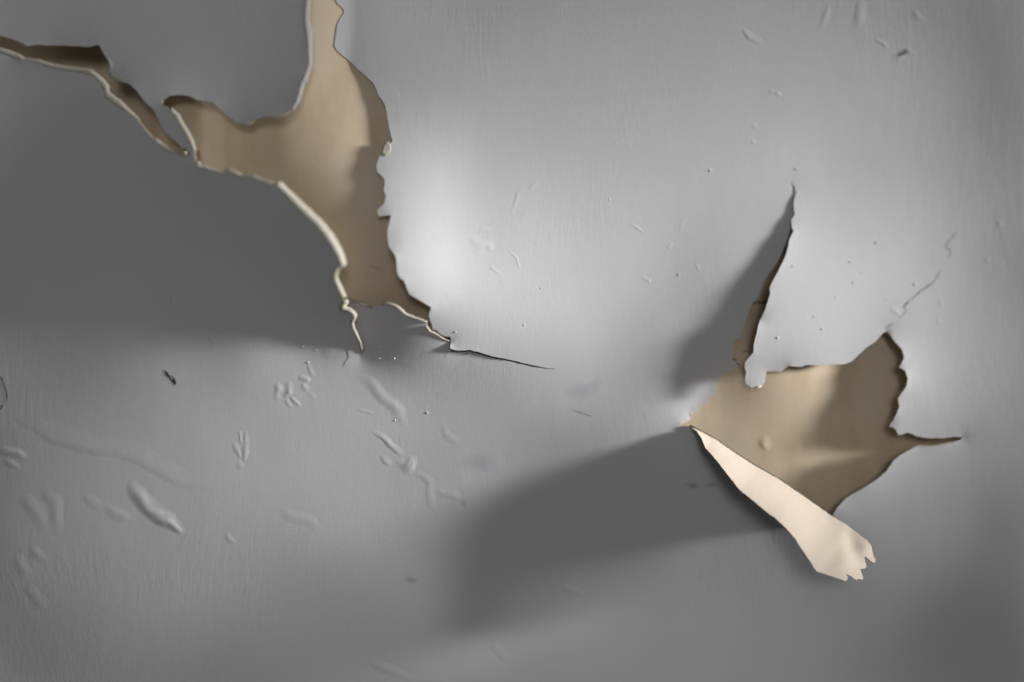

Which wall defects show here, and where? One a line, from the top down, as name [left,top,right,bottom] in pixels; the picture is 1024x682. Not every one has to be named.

peeling [0,0,552,369]
peeling [681,186,962,581]